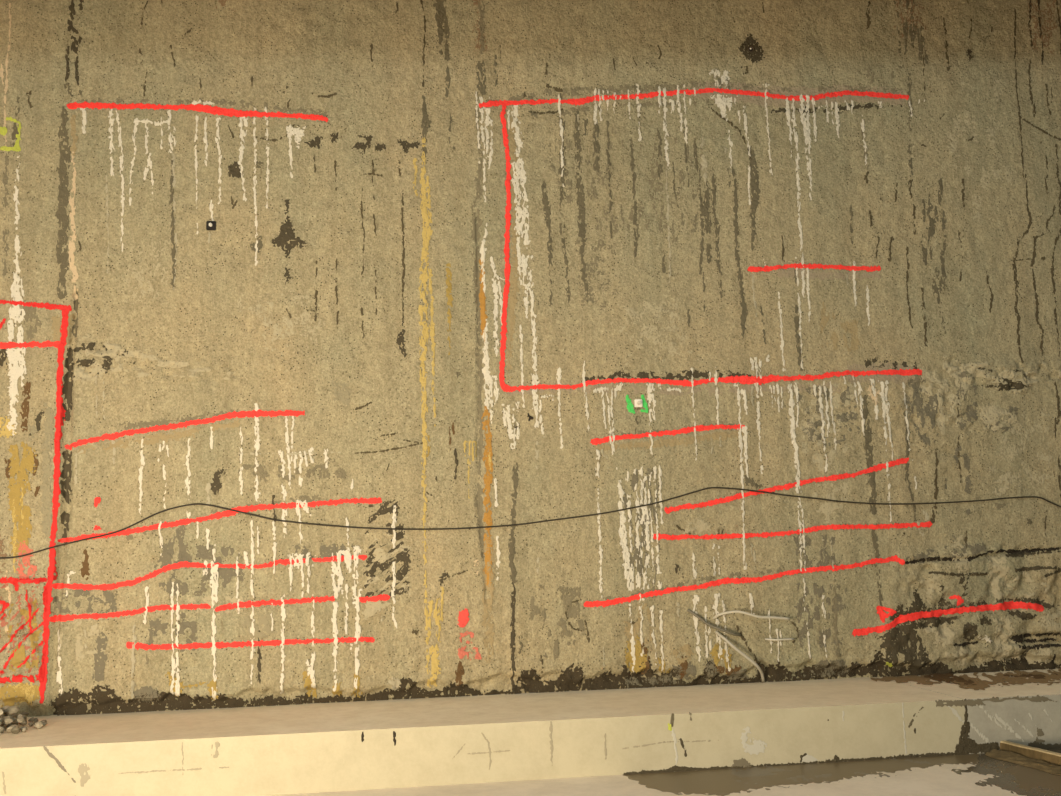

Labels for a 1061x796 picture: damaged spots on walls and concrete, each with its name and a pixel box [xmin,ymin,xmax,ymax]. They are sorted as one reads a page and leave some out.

water stain [433,0,451,98]
water stain [0,0,328,436]
corrosion [479,259,488,340]
water stain [471,0,929,561]
crack [864,0,1061,363]
corrosion [413,137,453,688]
water stain [51,354,1061,716]
spalling [942,445,973,494]
crack [902,381,1061,577]
spalling [974,615,1054,668]
spalling [986,553,1050,602]
crack [1010,602,1061,670]